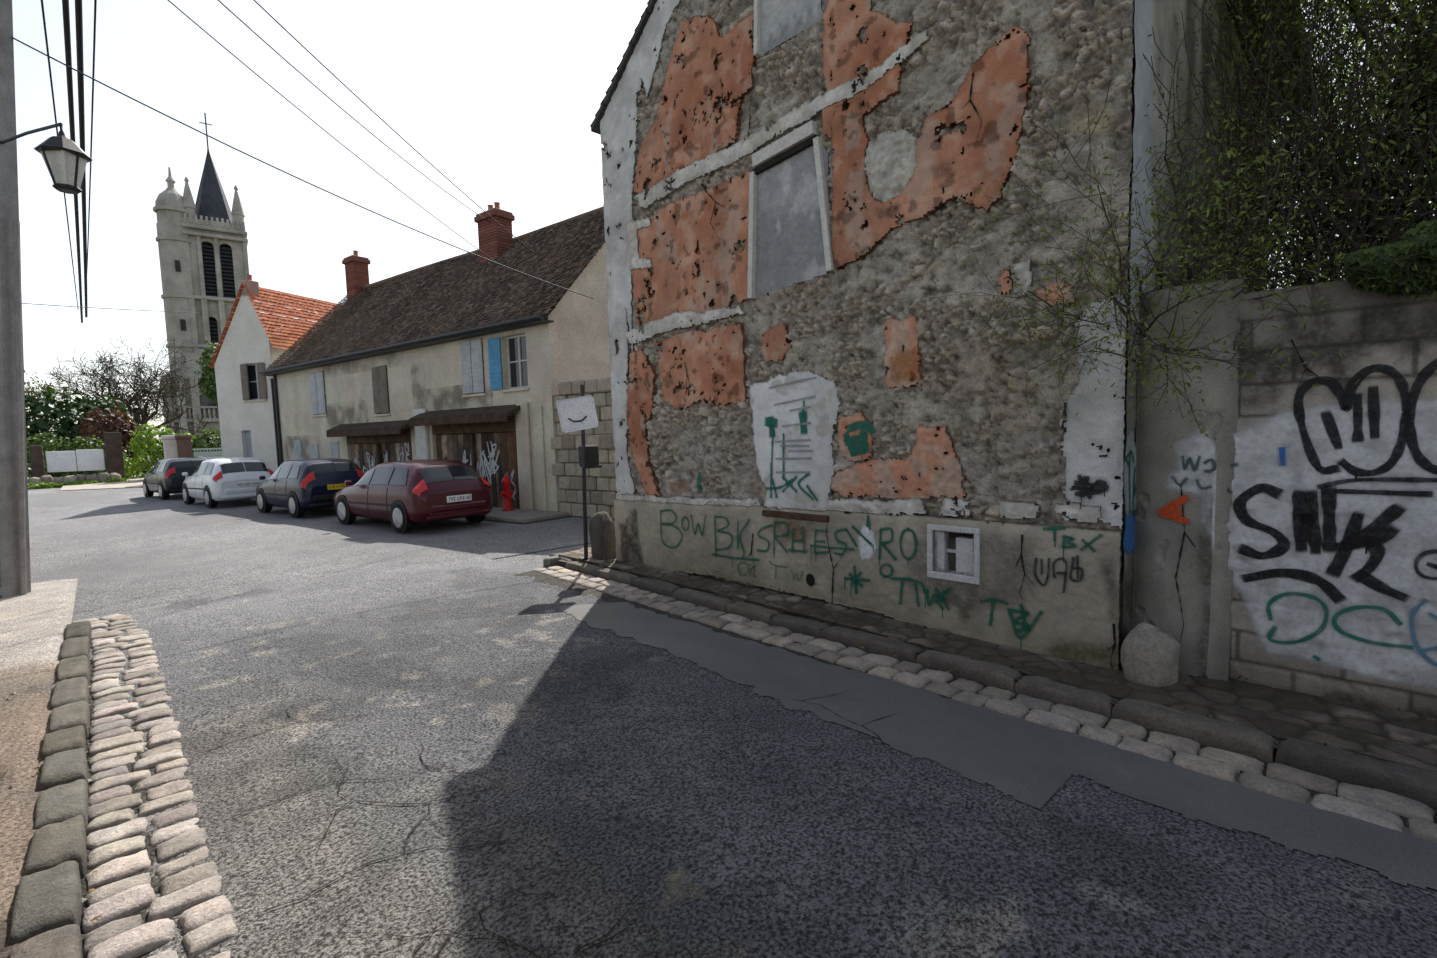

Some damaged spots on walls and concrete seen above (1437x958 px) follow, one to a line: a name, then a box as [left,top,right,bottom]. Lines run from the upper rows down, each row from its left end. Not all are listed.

spalling [600,0,1129,529]